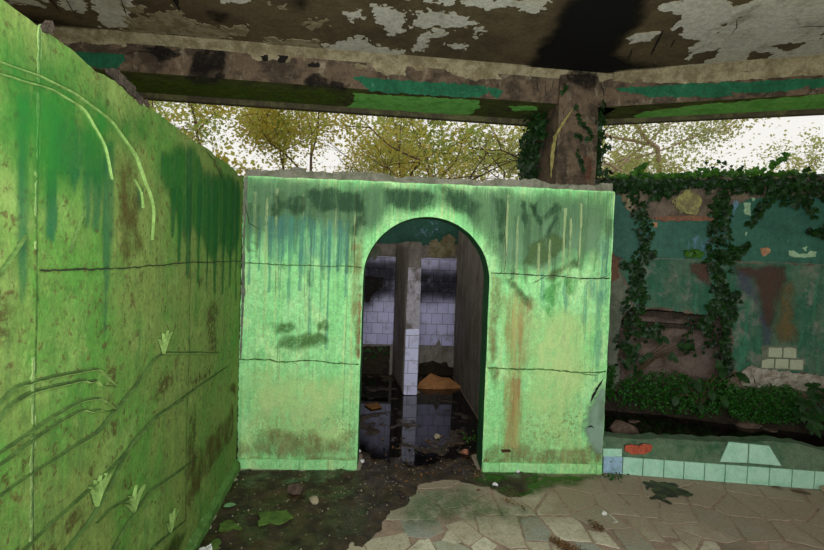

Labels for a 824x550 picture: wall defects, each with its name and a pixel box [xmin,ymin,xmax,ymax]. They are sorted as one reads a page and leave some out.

spalling [36,20,150,116]
peeling [3,0,250,40]
damp [147,45,180,61]
damp [187,49,225,84]
peeling [248,0,553,115]
damp [528,0,646,89]
peeling [608,0,824,118]
damp [6,54,114,282]
damp [161,148,612,306]
crack [33,149,364,550]
rust [501,301,528,452]
spalling [740,345,824,391]